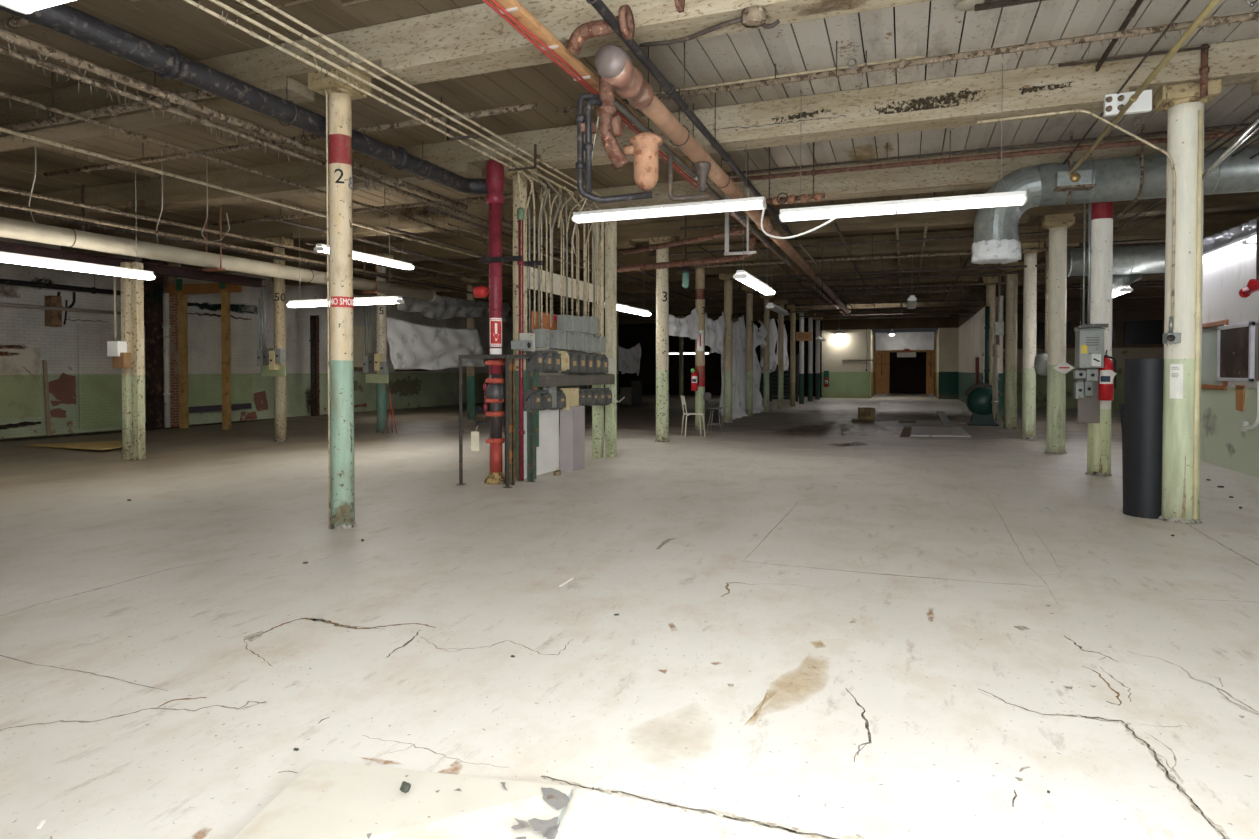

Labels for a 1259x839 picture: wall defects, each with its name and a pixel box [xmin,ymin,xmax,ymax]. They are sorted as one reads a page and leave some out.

leakage [771,109,830,123]
leakage [870,88,985,114]
leakage [1019,82,1072,95]
flaking render [48,373,77,418]
crack [656,538,676,549]
crack [720,494,1061,605]
crack [243,618,572,667]
crack [0,655,266,731]
crack [363,735,499,767]
crack [846,688,871,762]
crack [978,636,1259,839]
crack [540,775,865,839]